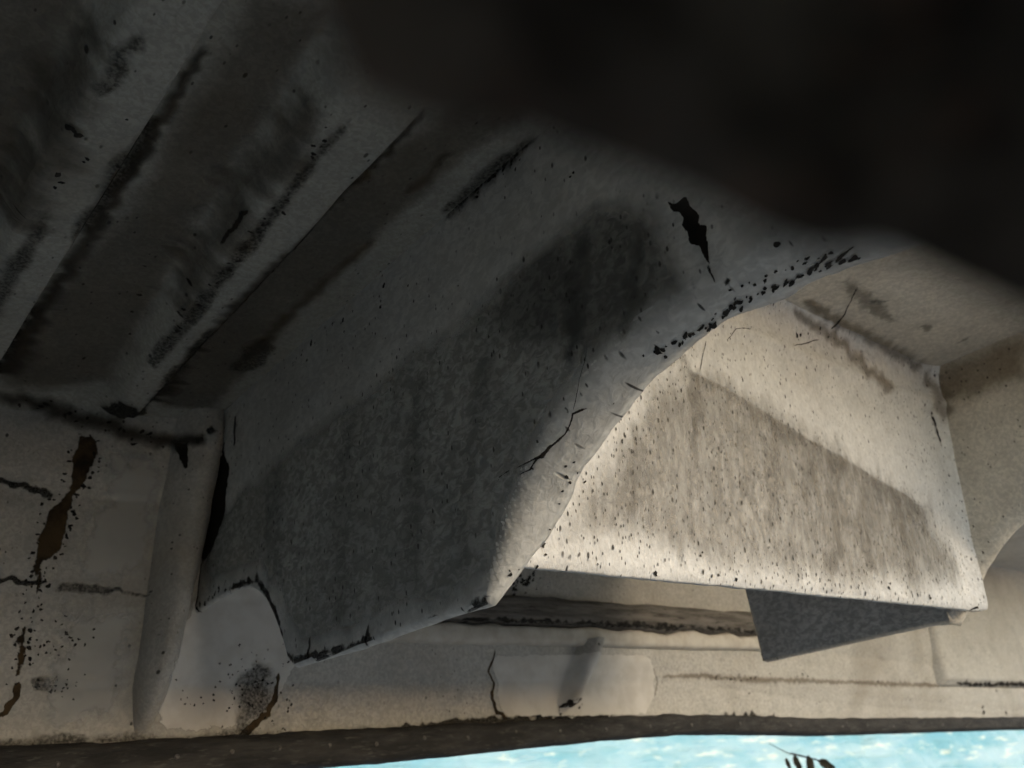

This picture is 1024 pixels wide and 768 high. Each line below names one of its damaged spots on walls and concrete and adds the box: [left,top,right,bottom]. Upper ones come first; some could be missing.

water stain [337,117,421,200]
water stain [444,141,534,218]
water stain [0,127,345,450]
spalling [642,197,861,359]
crack [0,575,147,597]
water stain [175,215,669,736]
crack [496,351,587,485]
water stain [555,362,967,660]